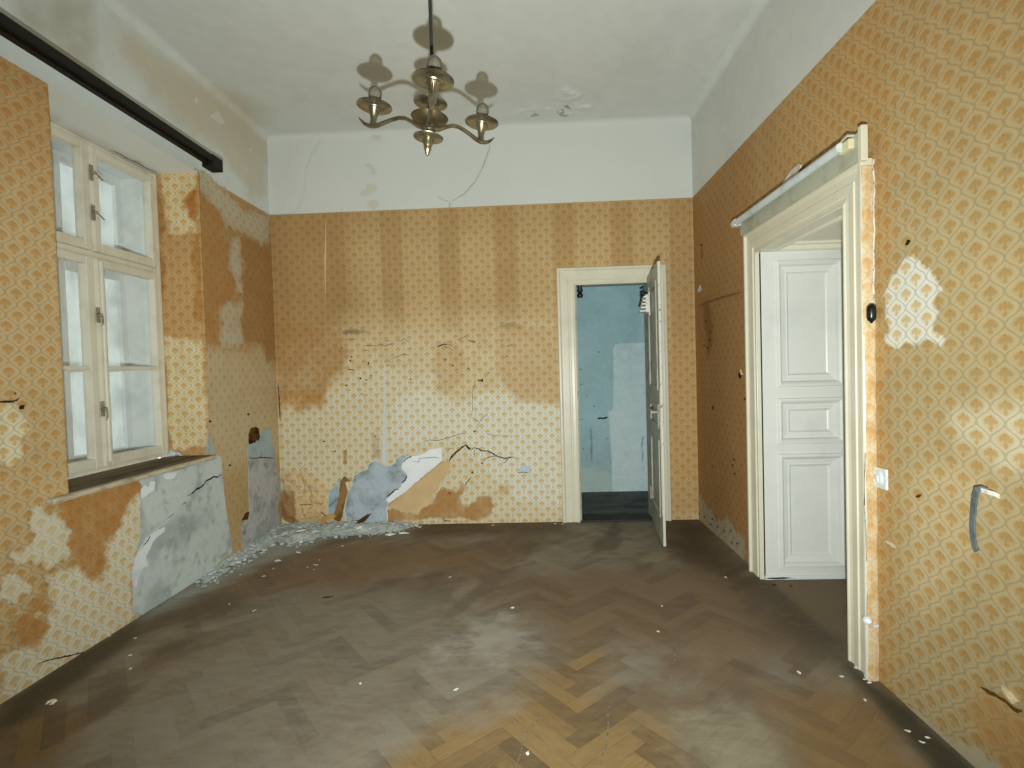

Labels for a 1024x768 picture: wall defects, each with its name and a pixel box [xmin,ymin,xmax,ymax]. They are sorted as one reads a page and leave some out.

crack [438,145,490,210]
damp [157,173,563,524]
crack [144,474,221,545]
flaking render [132,428,281,617]
flaking render [327,447,443,523]
crack [424,379,516,485]
damp [0,478,149,704]